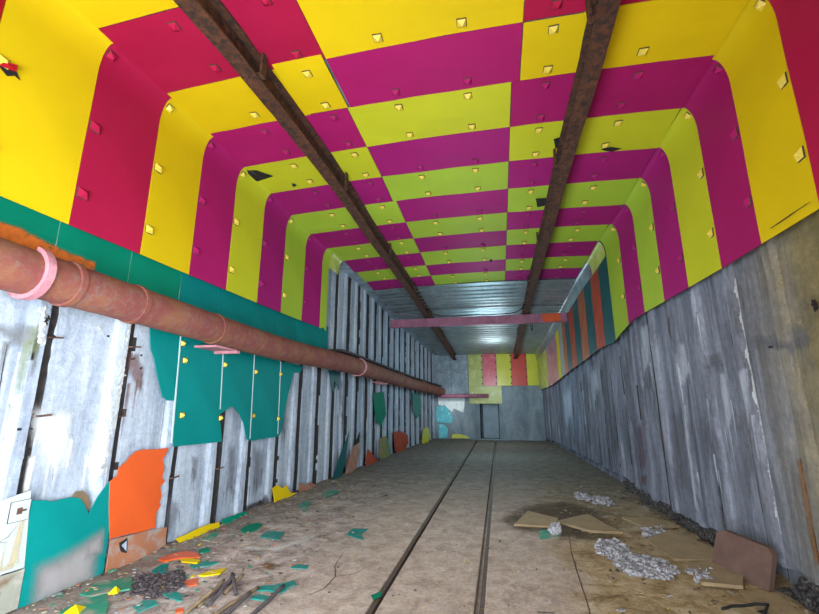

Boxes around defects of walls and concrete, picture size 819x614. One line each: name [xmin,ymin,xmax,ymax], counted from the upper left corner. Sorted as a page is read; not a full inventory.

rust [122,355,142,408]
peeling [36,534,102,602]